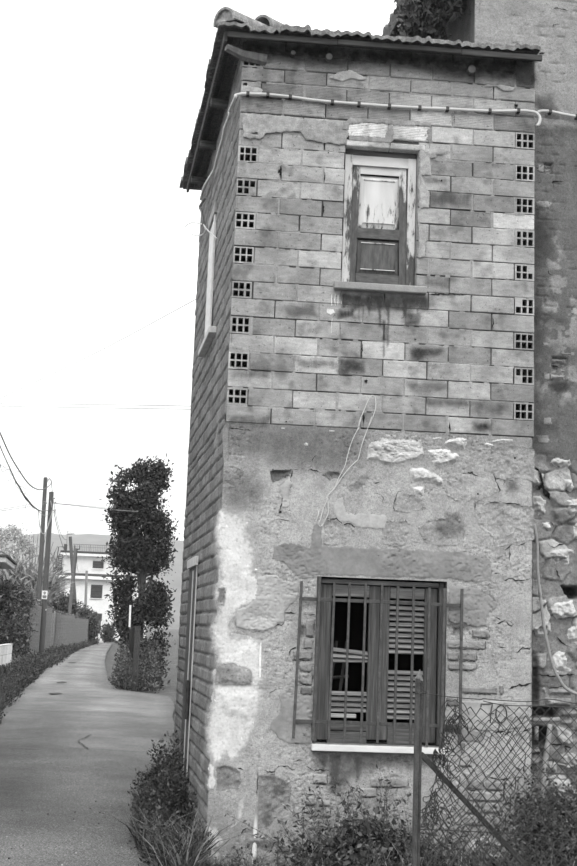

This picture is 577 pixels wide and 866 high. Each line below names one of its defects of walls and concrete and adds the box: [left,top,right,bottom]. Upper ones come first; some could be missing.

water stain [331,294,427,323]
spalling [270,469,292,482]
spalling [367,417,553,552]
flaking render [550,458,571,468]
flaking render [547,479,577,564]
flaking render [534,600,577,645]
peeling [207,510,274,828]
flaking render [551,651,571,673]
peeling [207,828,225,860]